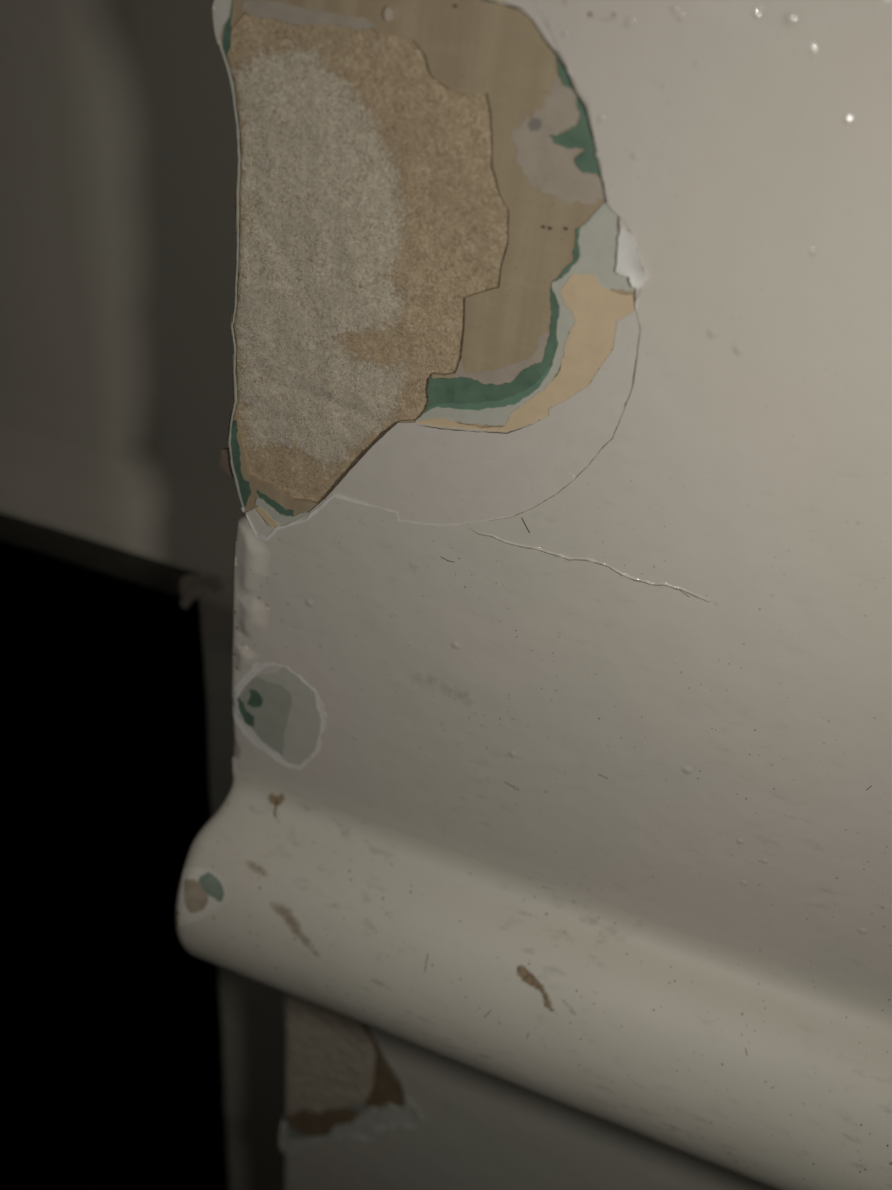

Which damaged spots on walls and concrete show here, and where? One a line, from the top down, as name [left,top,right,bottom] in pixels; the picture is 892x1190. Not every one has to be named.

peeling [212,0,649,541]
crack [469,526,717,602]
peeling [232,662,326,770]
peeling [279,993,423,1156]